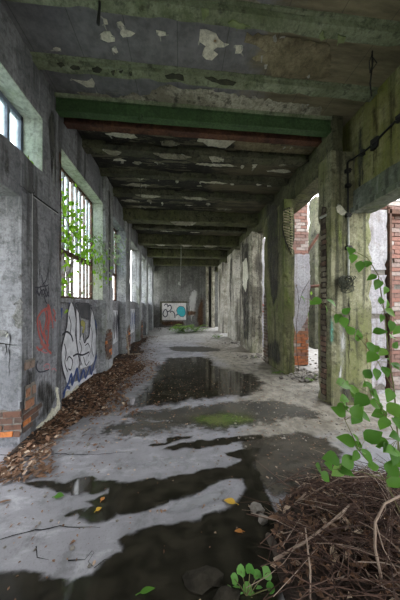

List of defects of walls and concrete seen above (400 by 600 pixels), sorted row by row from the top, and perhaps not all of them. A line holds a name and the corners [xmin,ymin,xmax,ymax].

peeling [100,16,135,55]
peeling [198,29,244,60]
peeling [102,149,141,165]
peeling [153,140,191,165]
peeling [195,156,244,169]
peeling [197,138,312,155]
peeling [121,178,163,208]
damp [267,205,279,304]
flaking render [0,381,79,438]